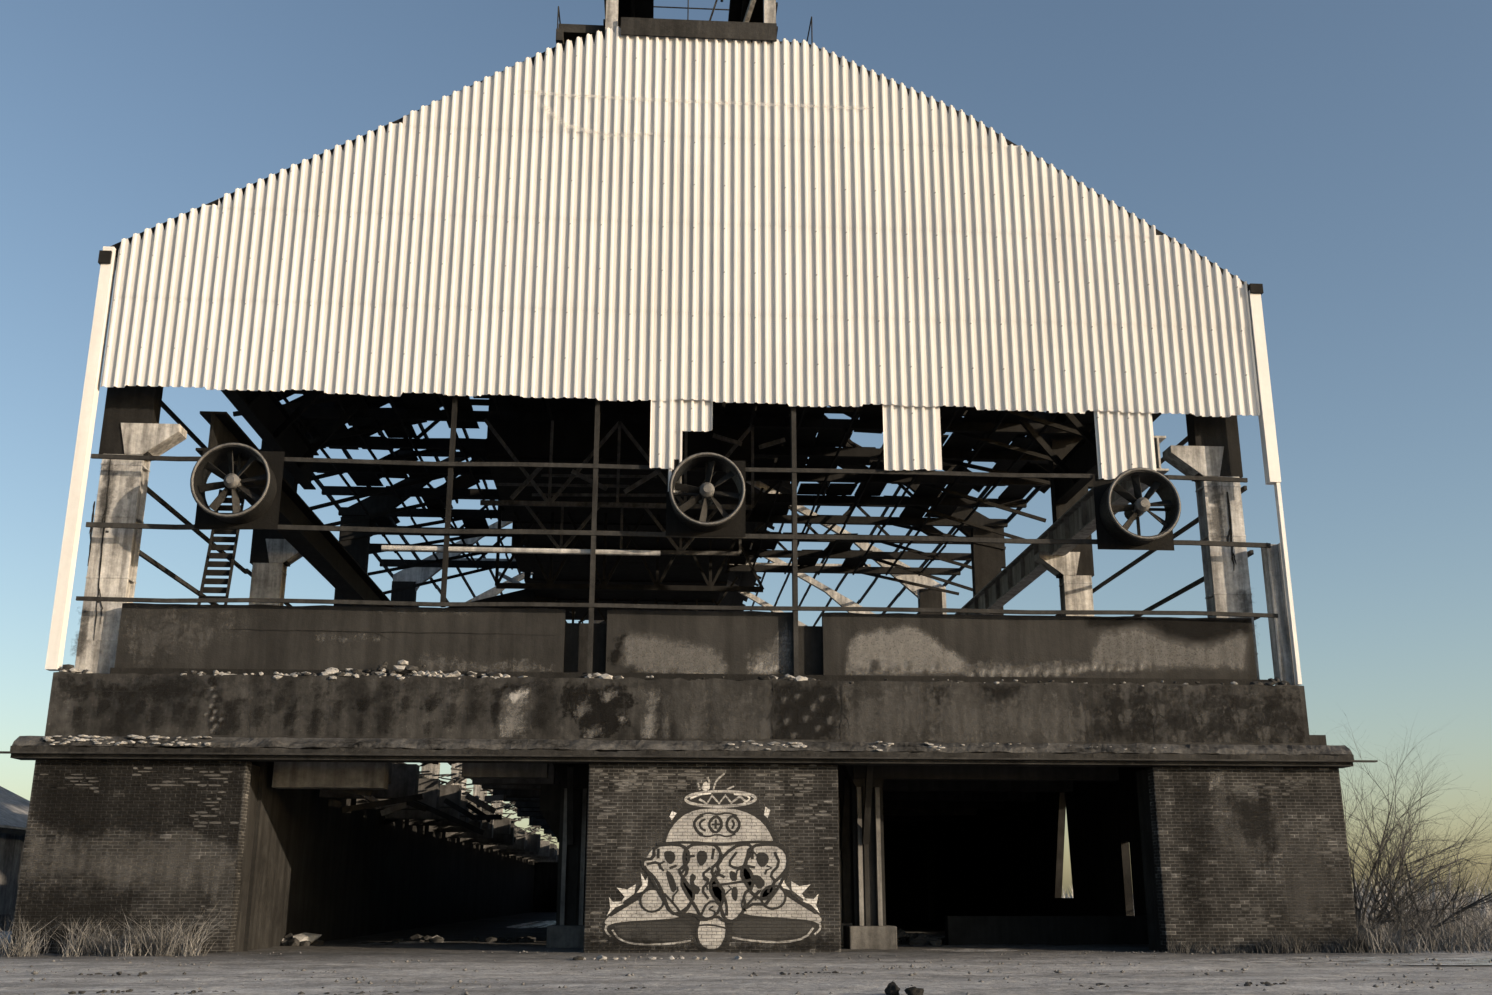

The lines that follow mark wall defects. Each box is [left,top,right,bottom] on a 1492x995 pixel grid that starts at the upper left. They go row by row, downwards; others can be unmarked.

peeling [560,635,726,738]
peeling [984,628,1247,687]
peeling [726,627,965,866]
spalling [592,767,704,865]